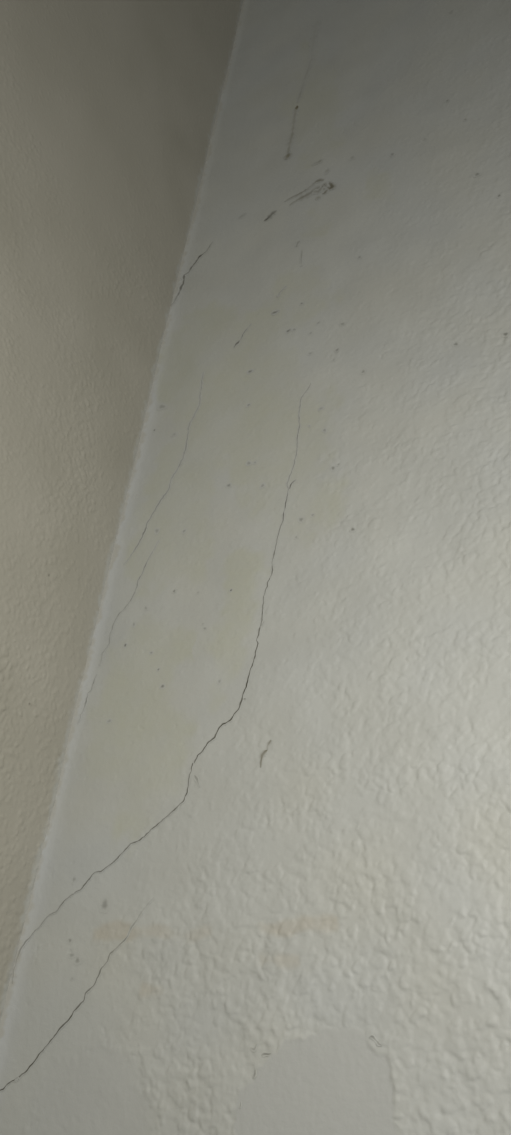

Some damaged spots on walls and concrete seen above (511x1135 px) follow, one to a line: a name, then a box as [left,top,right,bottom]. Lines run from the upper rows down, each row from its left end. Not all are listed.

crack [11,372,312,984]
crack [0,897,154,1092]